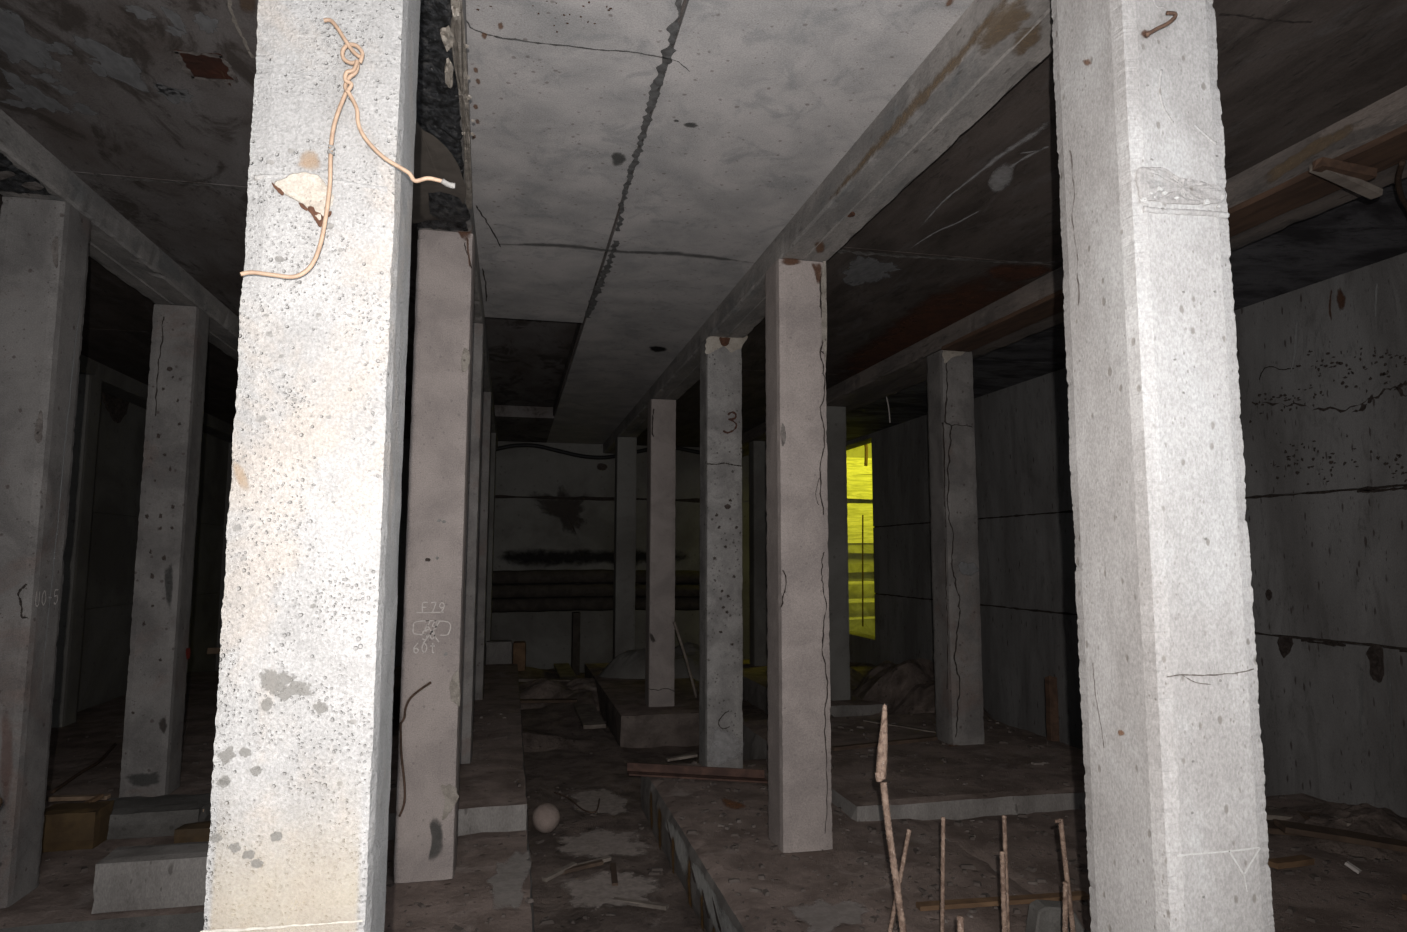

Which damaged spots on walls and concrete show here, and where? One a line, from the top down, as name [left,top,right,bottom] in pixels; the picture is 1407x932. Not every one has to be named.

crack [466,19,690,72]
spalling [267,160,334,229]
crack [942,363,972,737]